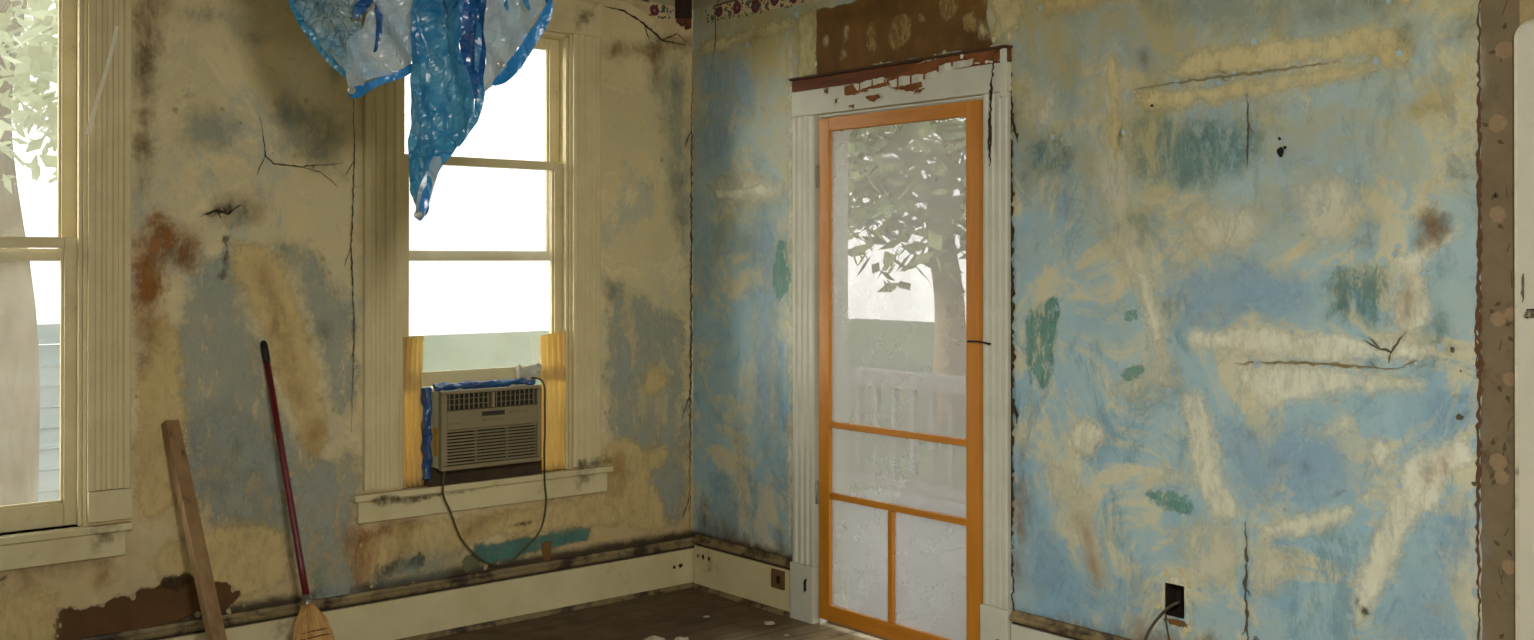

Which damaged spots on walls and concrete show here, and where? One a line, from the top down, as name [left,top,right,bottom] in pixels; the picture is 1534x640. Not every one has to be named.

flaking render [795,0,1012,110]
crack [1133,60,1340,164]
crack [201,100,355,432]
crack [1235,332,1417,370]
spalling [53,573,201,640]
spalling [215,581,241,614]
crack [1242,521,1250,640]